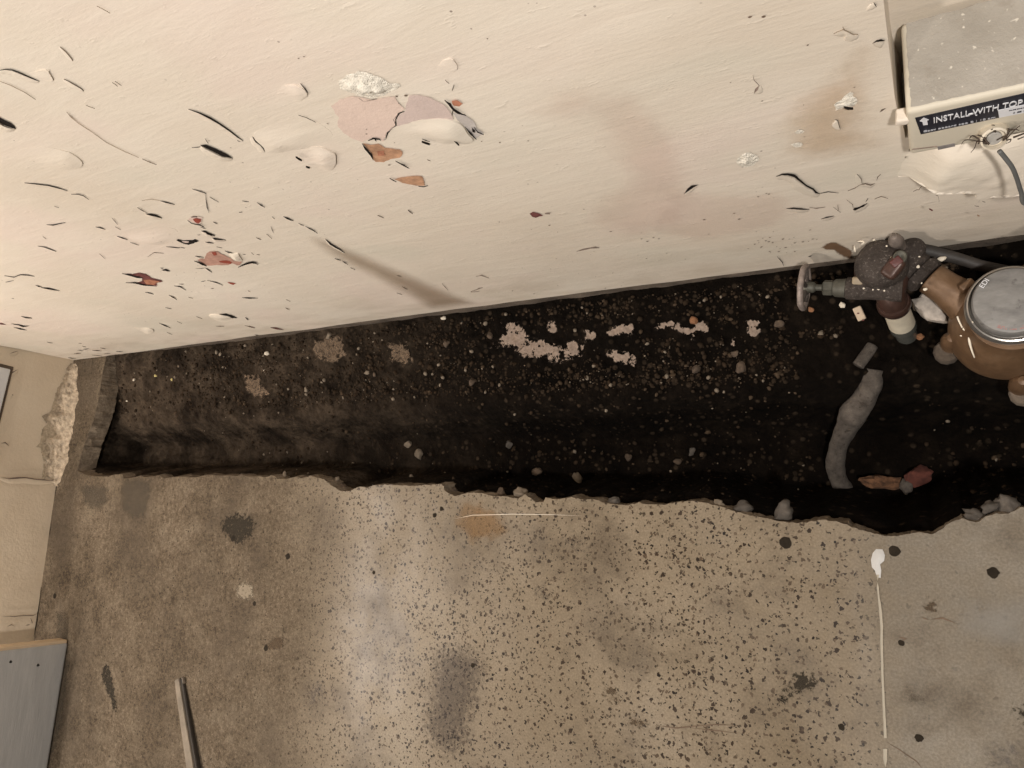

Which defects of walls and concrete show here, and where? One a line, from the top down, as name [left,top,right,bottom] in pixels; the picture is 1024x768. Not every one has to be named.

crack [0,47,156,165]
crack [188,109,265,162]
peeling [331,85,484,187]
peeling [188,216,204,227]
crack [776,173,888,221]
peeling [122,273,162,287]
crack [96,189,355,335]
peeling [195,251,258,268]
peeling [36,378,66,480]
damp [221,513,257,544]